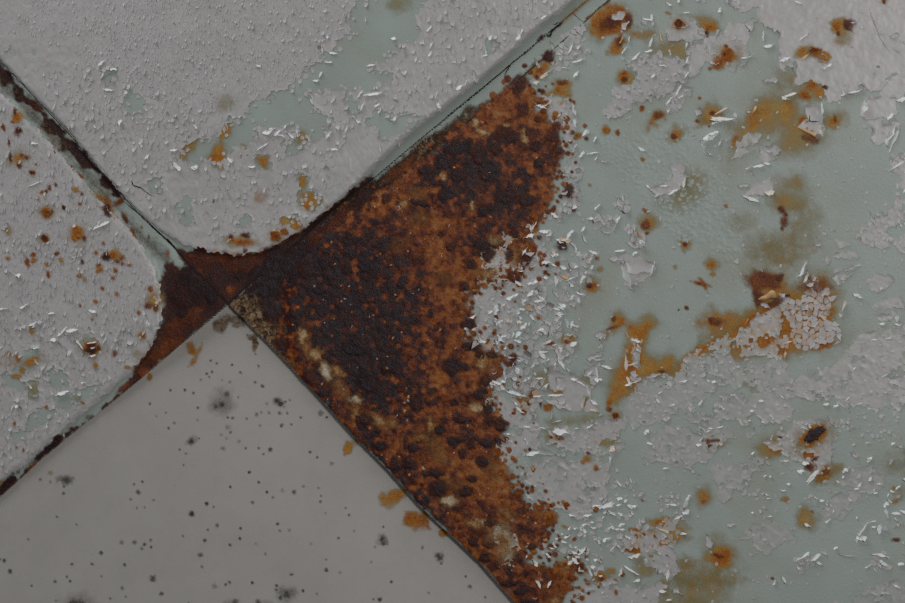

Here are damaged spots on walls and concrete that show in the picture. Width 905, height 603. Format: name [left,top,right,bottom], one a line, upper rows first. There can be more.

rust [586,1,653,55]
peeling [98,61,145,115]
peeling [170,0,442,171]
rust [731,76,827,151]
rust [0,66,150,242]
peeling [298,188,324,212]
peeling [50,327,106,357]
rust [102,51,625,603]
peeling [464,0,905,603]
rust [604,176,837,421]
peeling [12,366,101,442]
rust [0,416,93,495]